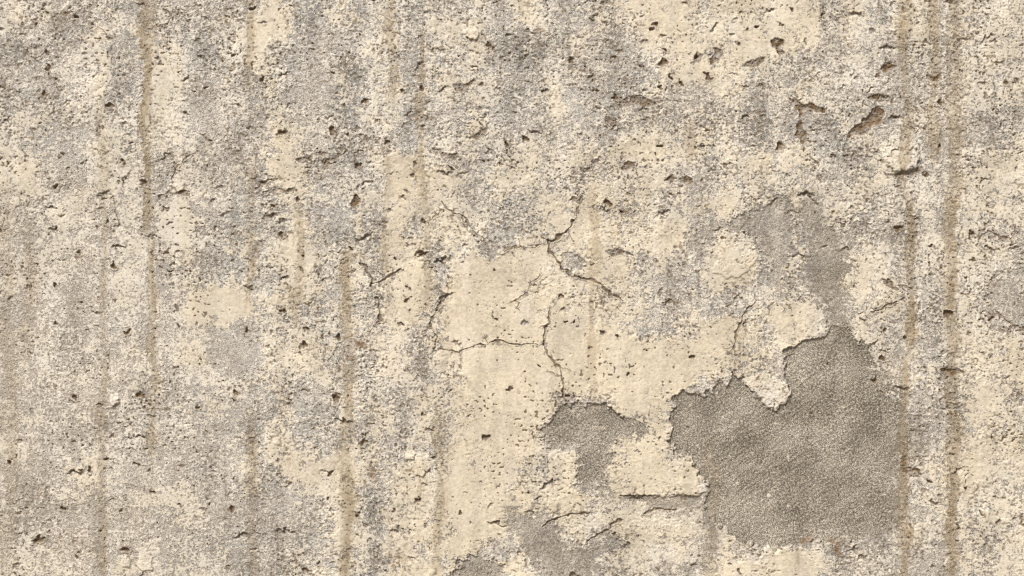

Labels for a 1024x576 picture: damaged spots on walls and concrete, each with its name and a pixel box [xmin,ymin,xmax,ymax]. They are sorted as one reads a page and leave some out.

crack [419,194,625,403]
spalling [445,188,924,576]
damp [890,0,971,576]